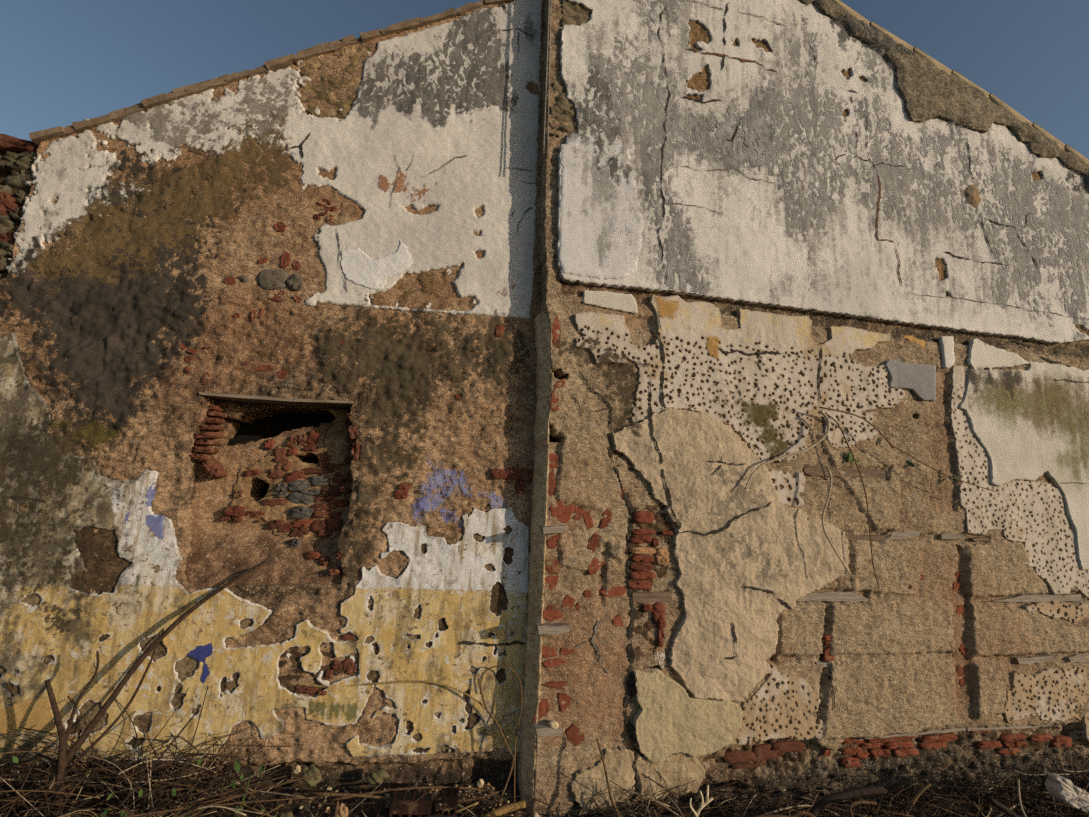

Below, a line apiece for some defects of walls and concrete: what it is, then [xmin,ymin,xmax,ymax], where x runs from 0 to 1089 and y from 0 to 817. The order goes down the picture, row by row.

spalling [29,0,514,146]
damp [378,170,430,202]
crack [658,0,786,283]
damp [568,0,1089,340]
crack [836,87,1089,320]
damp [0,73,300,634]
crack [649,314,773,538]
damp [967,364,1089,437]
spalling [71,511,133,594]
peeling [140,634,213,714]
spalling [278,633,380,697]
crack [572,371,643,796]